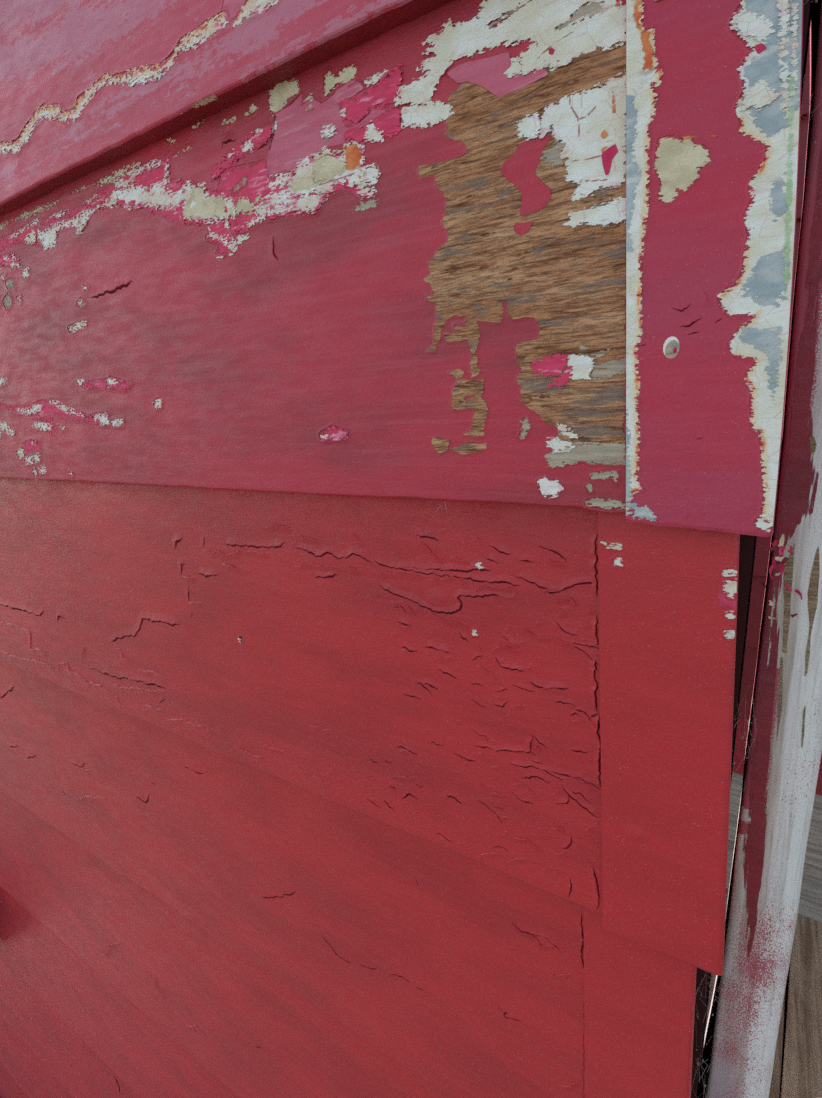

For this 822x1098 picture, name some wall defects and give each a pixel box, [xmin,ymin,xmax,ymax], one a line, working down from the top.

peeling [0,0,717,525]
peeling [714,0,822,959]
peeling [600,538,626,571]
crack [0,598,65,701]
crack [90,529,601,852]
crack [260,888,296,899]
crack [504,867,600,985]